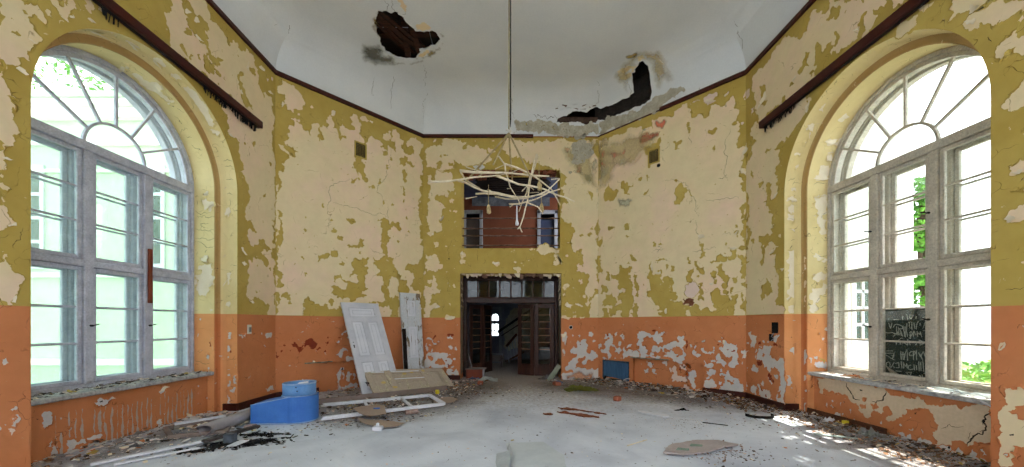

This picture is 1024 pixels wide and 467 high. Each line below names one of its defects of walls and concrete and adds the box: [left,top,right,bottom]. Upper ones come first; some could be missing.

leakage [364,47,393,63]
peeling [894,0,935,40]
peeling [947,0,1024,64]
peeling [118,62,182,124]
peeling [1000,70,1024,113]
peeling [0,0,141,306]
leakage [565,120,665,184]
peeling [152,0,908,405]
peeling [1003,158,1024,224]
peeling [37,410,104,460]
flaking render [789,337,1024,467]
crack [941,412,991,446]